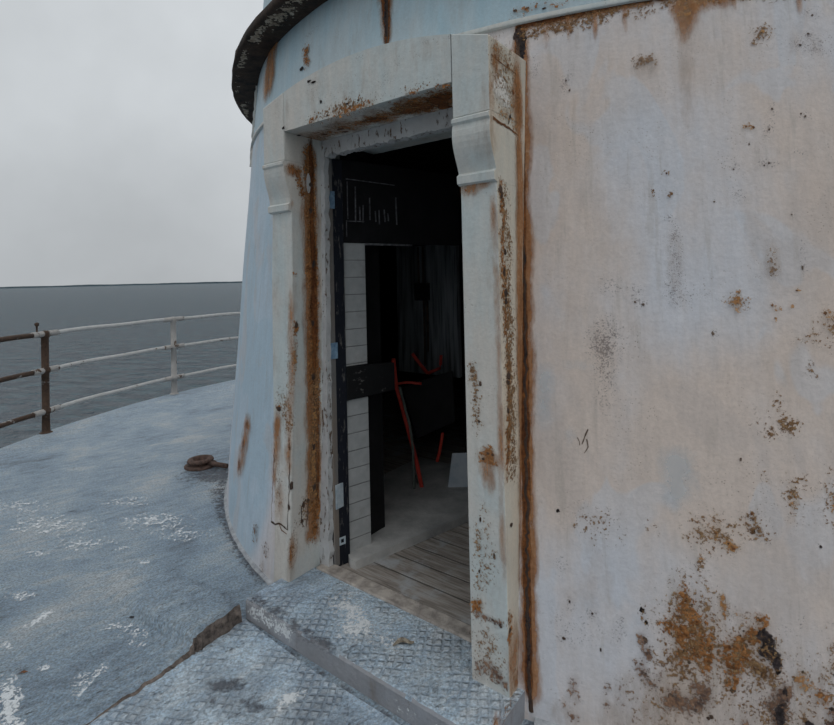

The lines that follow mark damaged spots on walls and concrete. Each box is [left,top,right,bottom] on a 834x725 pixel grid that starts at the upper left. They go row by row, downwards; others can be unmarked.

rust [380,0,391,44]
rust [274,81,453,543]
rust [797,309,834,349]
rust [757,392,804,442]
rust [237,420,250,471]
rust [478,408,503,483]
rust [781,476,812,516]
rust [603,513,834,725]